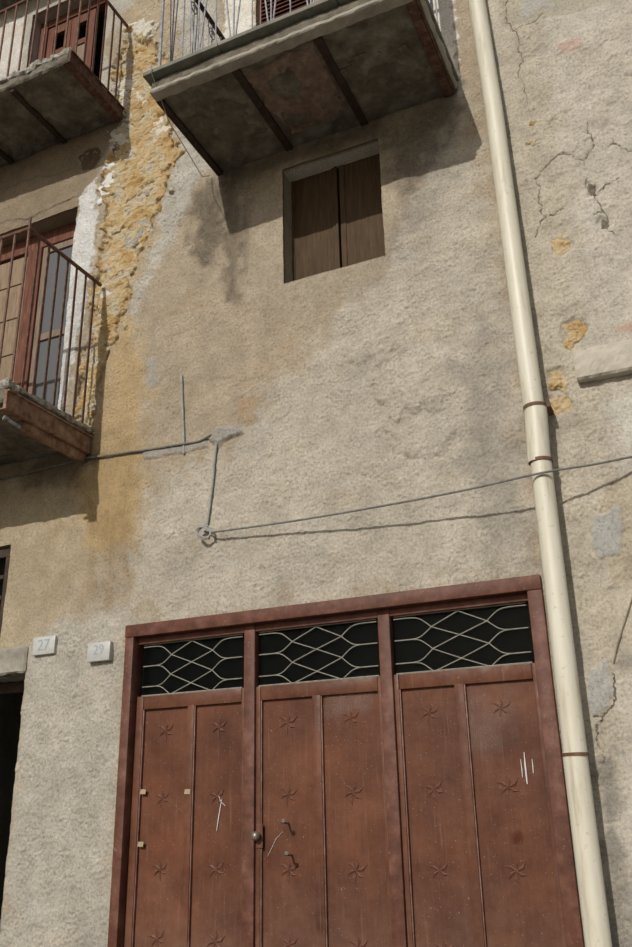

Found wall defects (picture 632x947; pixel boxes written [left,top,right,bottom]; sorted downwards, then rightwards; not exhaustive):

crack [505,0,541,105]
flaking render [70,18,186,435]
crack [535,122,631,238]
flaking render [562,319,588,351]
flaking render [547,371,572,416]